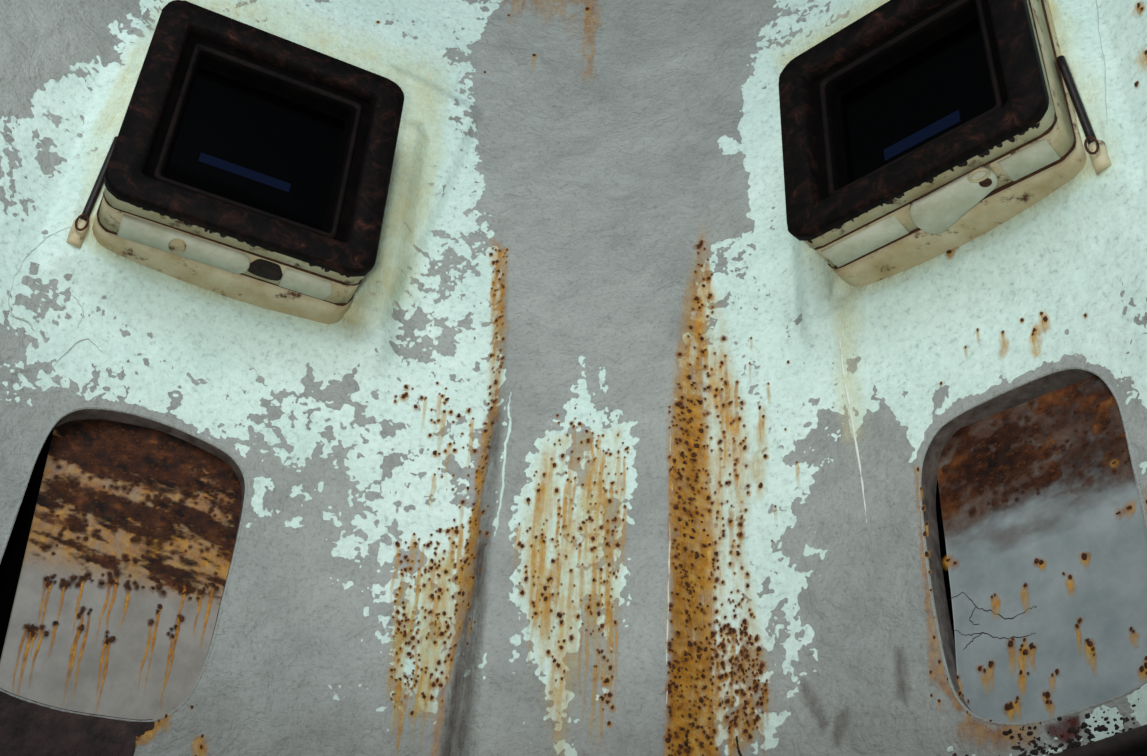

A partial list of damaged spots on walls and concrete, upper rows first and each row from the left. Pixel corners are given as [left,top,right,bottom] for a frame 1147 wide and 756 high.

corrosion [14,419,242,692]
corrosion [136,713,170,743]
peeling [0,0,850,756]
corrosion [390,247,508,756]
corrosion [517,407,629,725]
corrosion [665,240,768,756]
peeling [691,353,1147,756]
corrosion [977,637,1036,738]
corrosion [936,375,1135,536]
corrosion [1075,617,1095,664]
peeling [1120,280,1147,359]